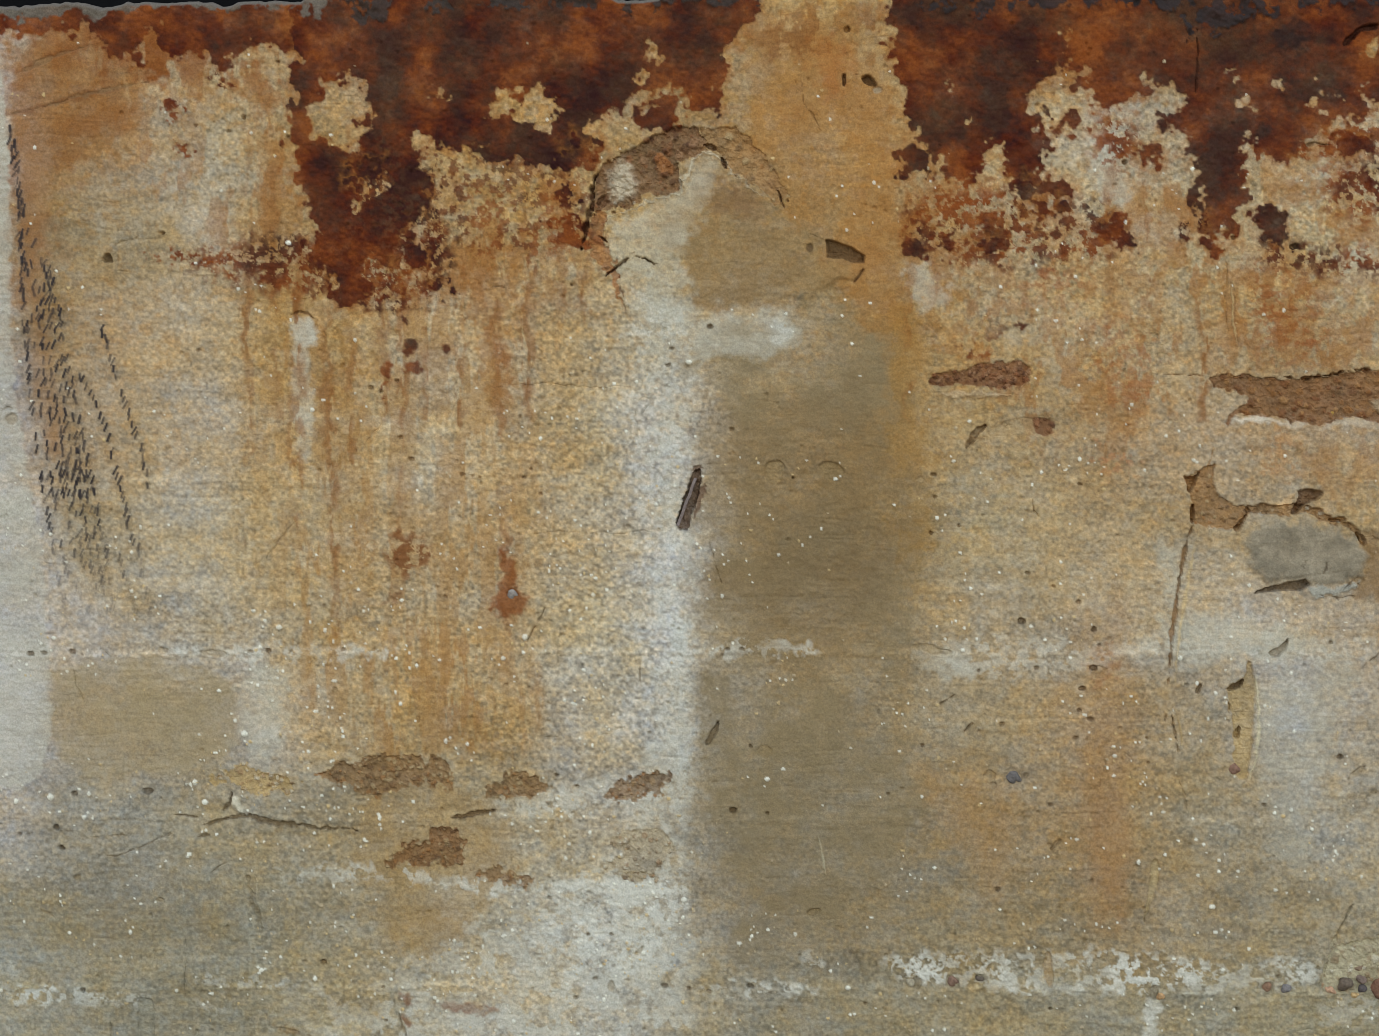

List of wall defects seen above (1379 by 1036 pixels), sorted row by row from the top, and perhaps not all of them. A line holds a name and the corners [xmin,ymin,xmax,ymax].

spalling [588,126,790,312]
corrosion [0,0,1379,778]
spalling [929,360,1033,400]
spalling [965,414,1058,449]
spalling [1164,368,1379,427]
spalling [1183,464,1379,548]
spalling [208,752,455,800]
spalling [603,770,674,805]
corrosion [1019,557,1157,957]
corrosion [330,775,544,964]
spalling [384,826,536,892]
corrosion [906,741,1035,920]